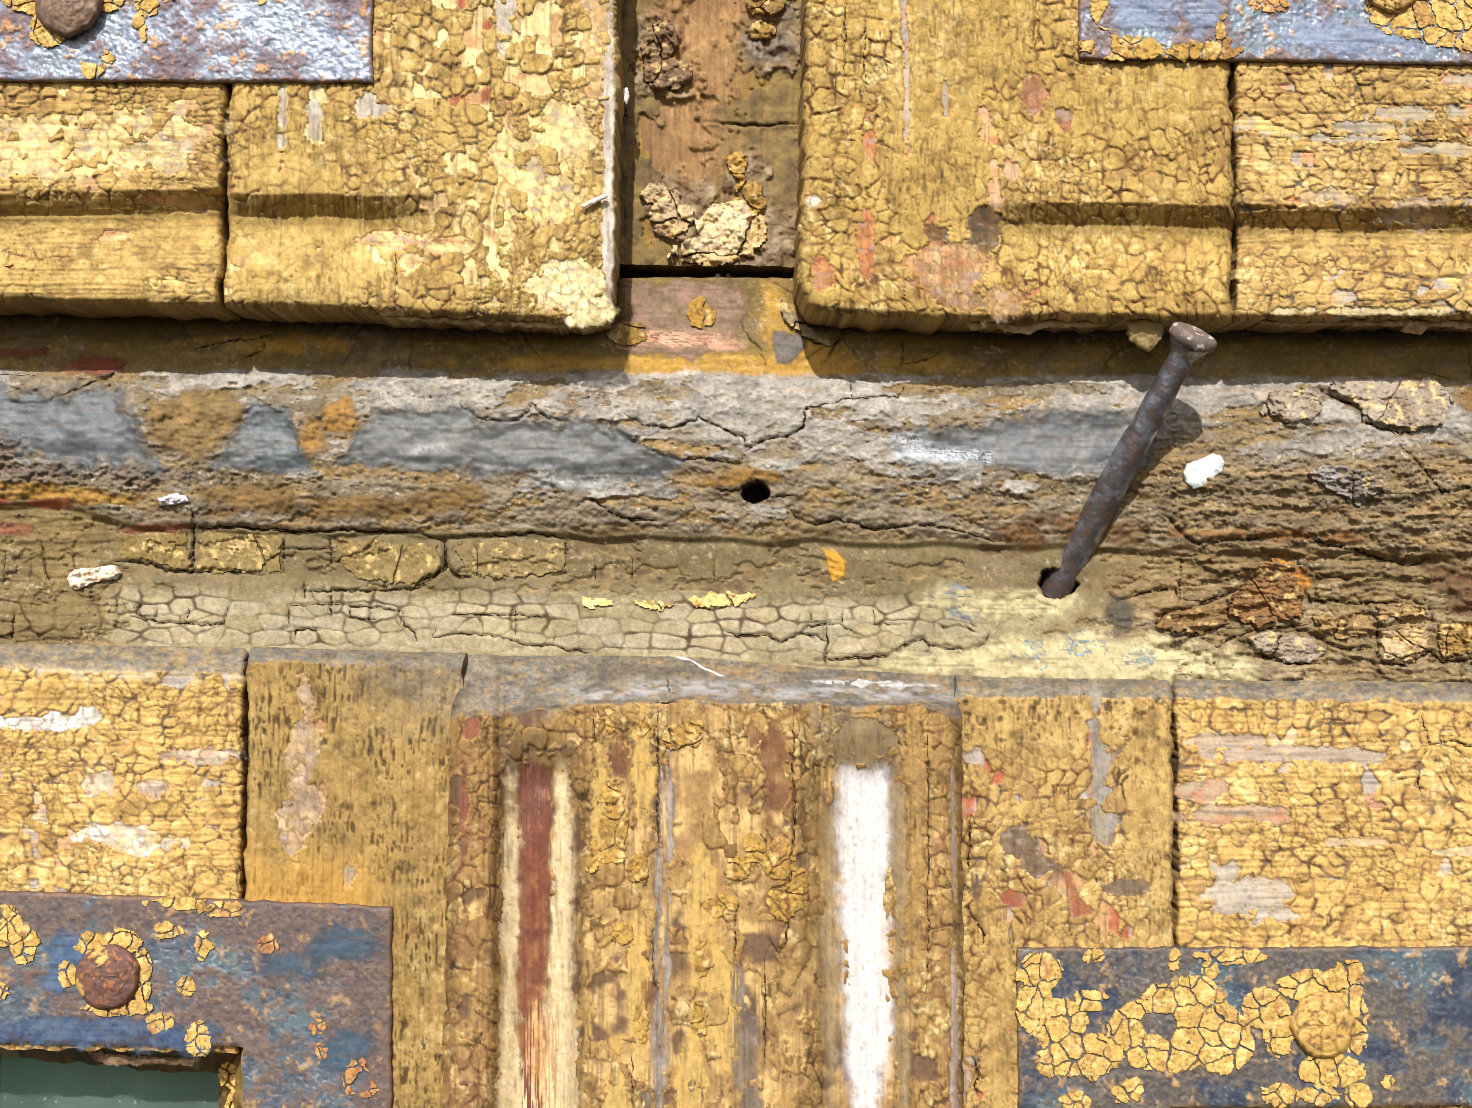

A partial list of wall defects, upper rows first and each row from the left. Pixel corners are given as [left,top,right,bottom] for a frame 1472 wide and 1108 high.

crack [843,0,867,92]
peeling [362,0,786,360]
peeling [1258,376,1455,431]
peeling [1182,453,1225,489]
peeling [67,529,284,589]
crack [115,498,656,654]
peeling [335,536,567,587]
crack [722,602,989,661]
rust [1000,515,1079,552]
peeling [877,558,1472,683]
peeling [494,703,703,1108]
peeling [671,721,911,1108]